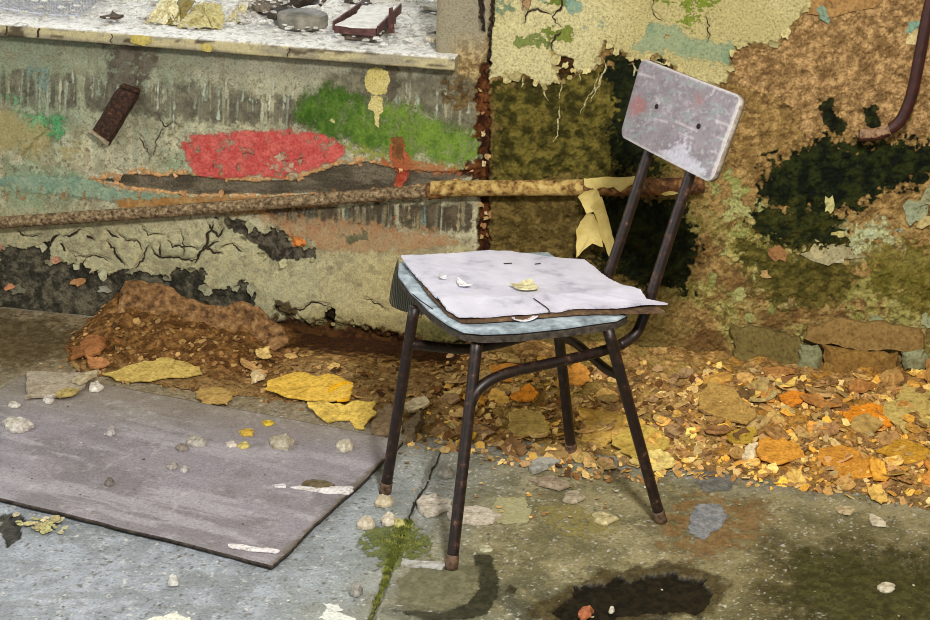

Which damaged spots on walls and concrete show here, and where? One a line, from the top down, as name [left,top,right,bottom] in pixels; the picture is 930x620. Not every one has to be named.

water stain [1,69,121,117]
water stain [130,75,314,132]
peeling [489,0,930,147]
spalling [0,241,257,316]
crack [18,219,241,268]
spalling [215,214,316,268]
peeling [576,176,635,257]
water stain [706,97,930,328]
peeling [825,195,835,214]
peeling [801,231,867,266]
crack [396,452,441,551]
spalling [519,560,732,620]